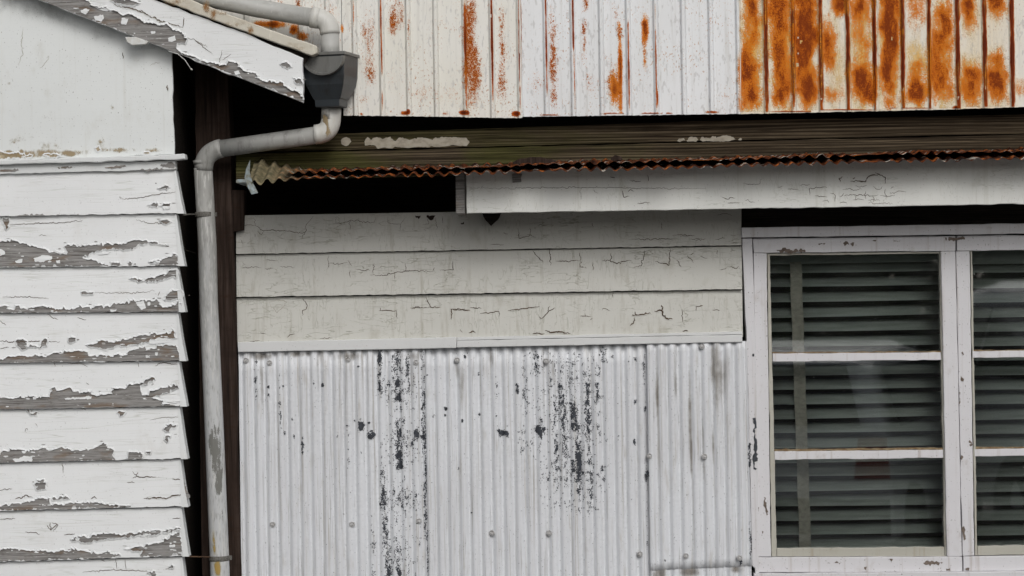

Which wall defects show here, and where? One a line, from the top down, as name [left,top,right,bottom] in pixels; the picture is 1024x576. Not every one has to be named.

peeling [41,0,306,101]
rust [249,20,309,41]
rust [341,0,559,117]
rust [572,0,672,114]
rust [737,0,1024,112]
peeling [0,327,180,363]
peeling [0,214,184,313]
crack [328,257,454,278]
crack [380,291,720,335]
crack [481,173,905,270]
peeling [0,376,180,418]
peeling [0,526,183,576]